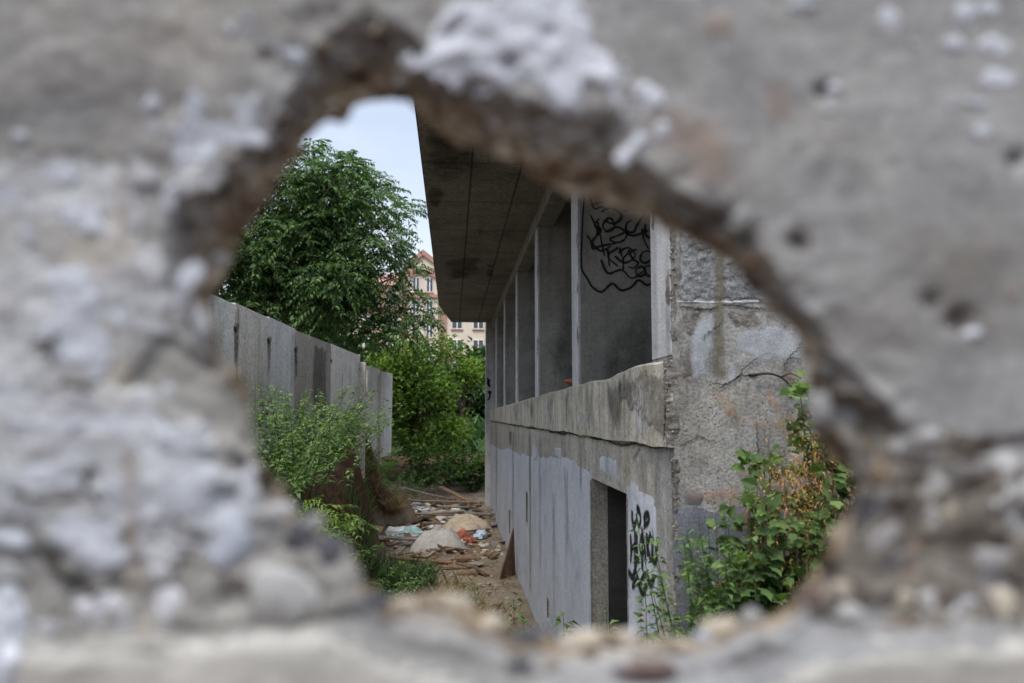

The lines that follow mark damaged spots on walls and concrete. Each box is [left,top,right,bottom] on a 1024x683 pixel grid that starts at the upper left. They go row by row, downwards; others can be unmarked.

flaking render [0,89,419,683]
peeling [276,40,333,67]
peeling [346,0,809,682]
crack [704,343,801,388]